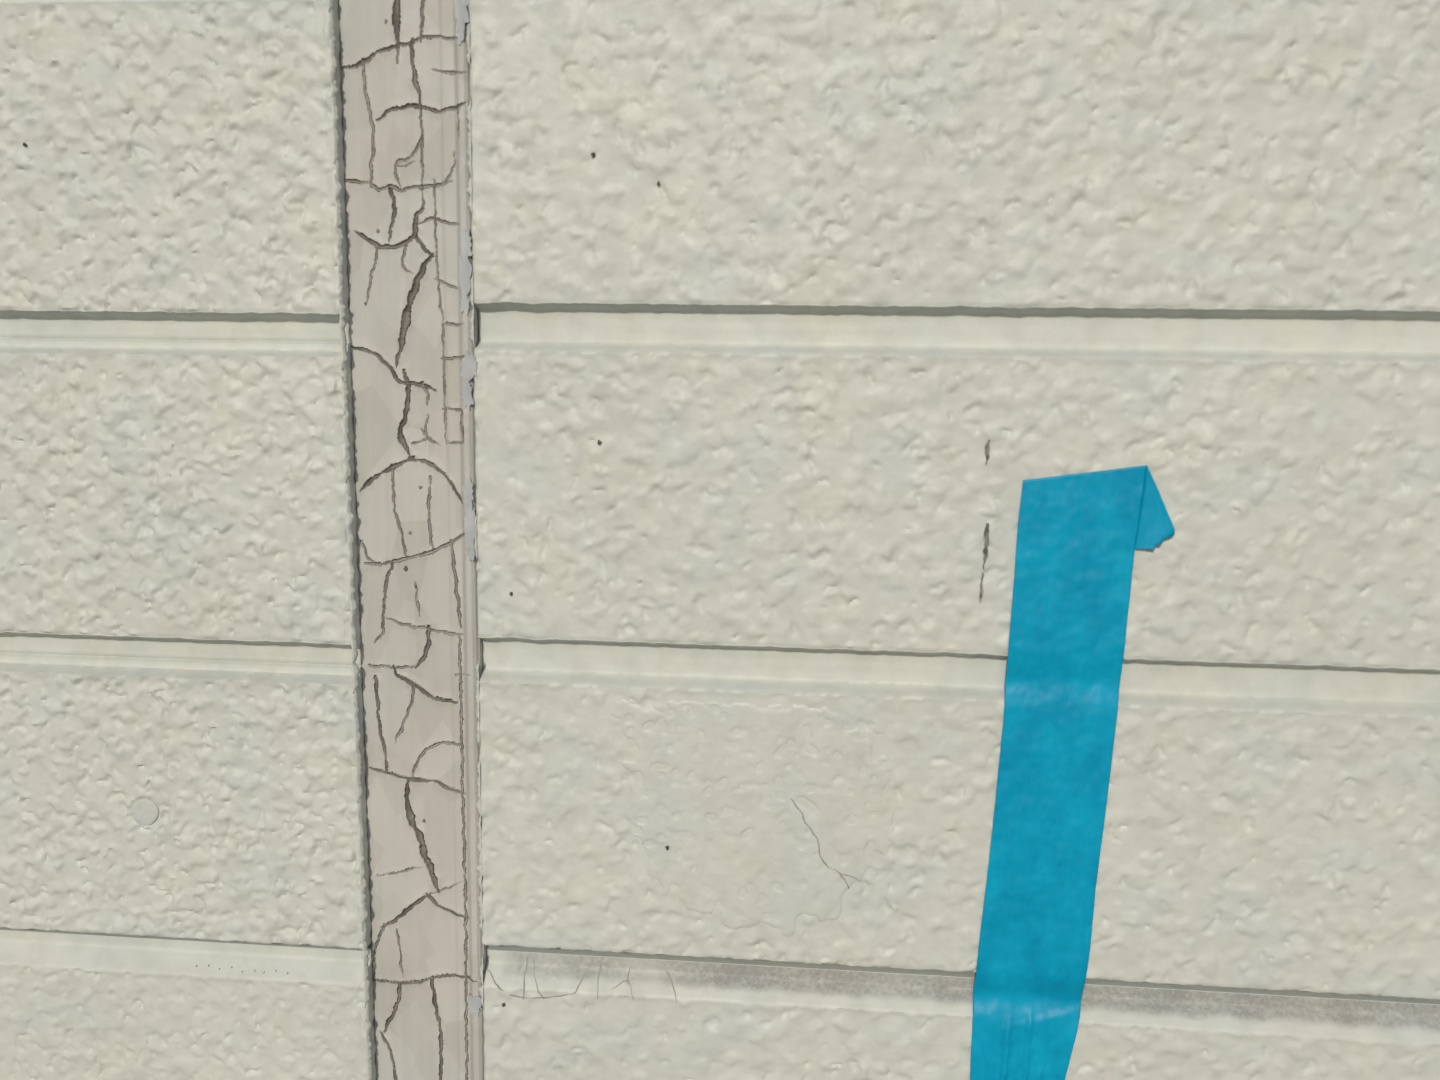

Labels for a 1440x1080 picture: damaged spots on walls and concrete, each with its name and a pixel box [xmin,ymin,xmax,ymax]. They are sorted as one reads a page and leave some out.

crack [342,0,634,1080]